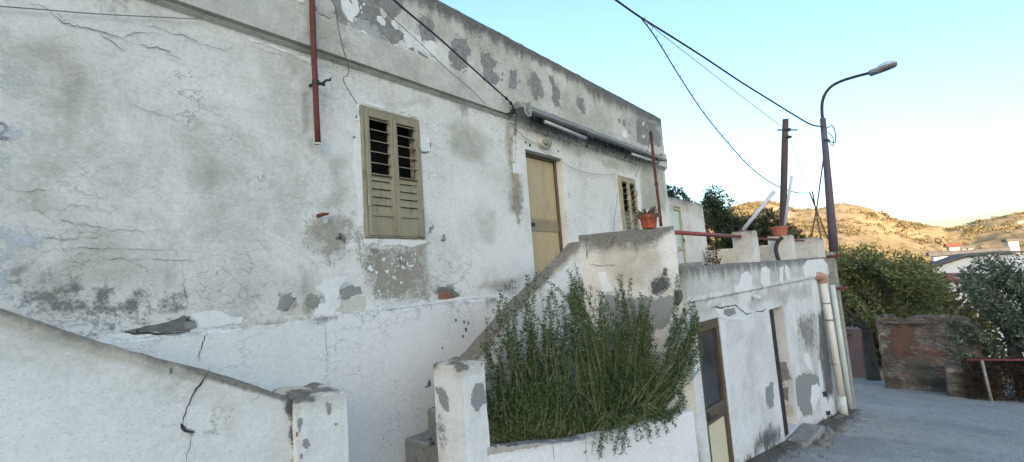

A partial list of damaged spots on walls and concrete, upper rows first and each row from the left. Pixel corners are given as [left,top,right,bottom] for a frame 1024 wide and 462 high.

crack [24,0,289,82]
flaking render [330,0,562,108]
flaking render [618,115,661,147]
damp [24,284,145,329]
crack [43,217,193,309]
flaking render [106,309,247,339]
peeling [277,276,375,317]
damp [305,215,460,301]
flaking render [544,263,683,340]
crack [183,336,209,461]
flaking render [471,382,487,411]
flaking render [765,352,830,417]